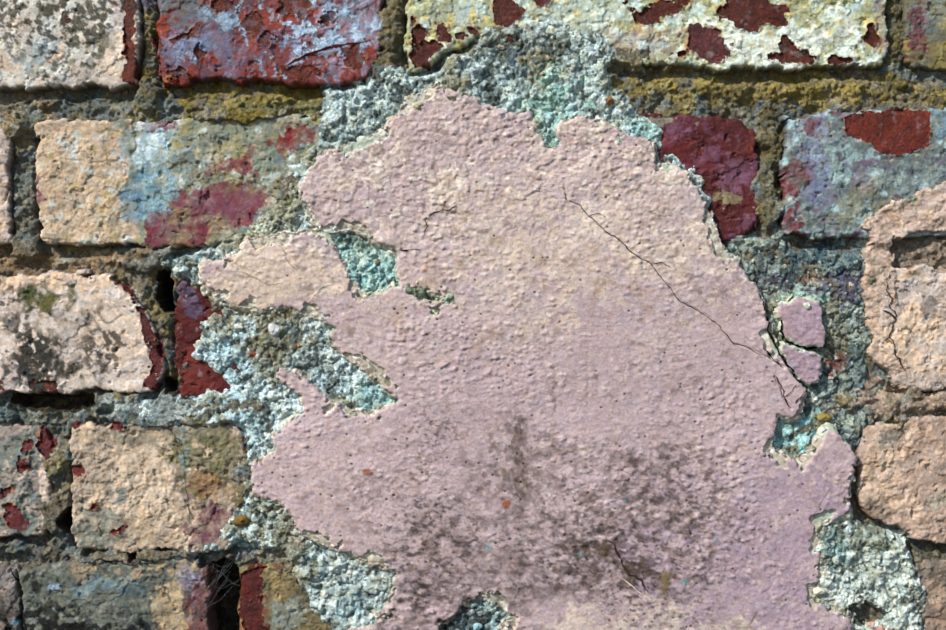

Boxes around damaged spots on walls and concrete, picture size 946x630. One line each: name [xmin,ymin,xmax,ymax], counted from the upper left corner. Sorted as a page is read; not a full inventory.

peeling [150,22,207,59]
peeling [678,0,854,65]
peeling [864,23,880,47]
spalling [161,0,711,315]
peeling [844,107,931,155]
peeling [118,278,165,420]
crack [564,189,822,408]
spalling [722,225,891,459]
crack [883,272,946,393]
spalling [164,292,397,630]
spalling [443,594,508,630]
spalling [809,519,927,630]